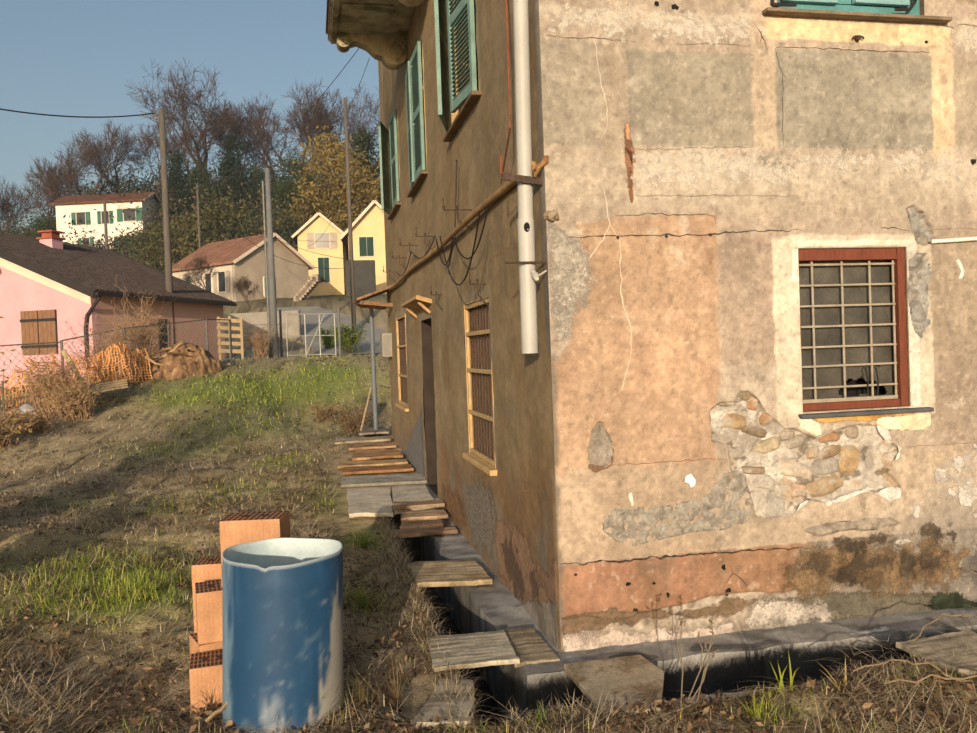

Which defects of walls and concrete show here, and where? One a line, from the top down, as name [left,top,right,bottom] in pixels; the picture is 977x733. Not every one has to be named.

corrosion [623,123,636,203]
crack [569,186,802,395]
flaking render [588,421,614,467]
flaking render [719,392,902,513]
peeling [930,438,977,519]
leakage [561,522,977,635]